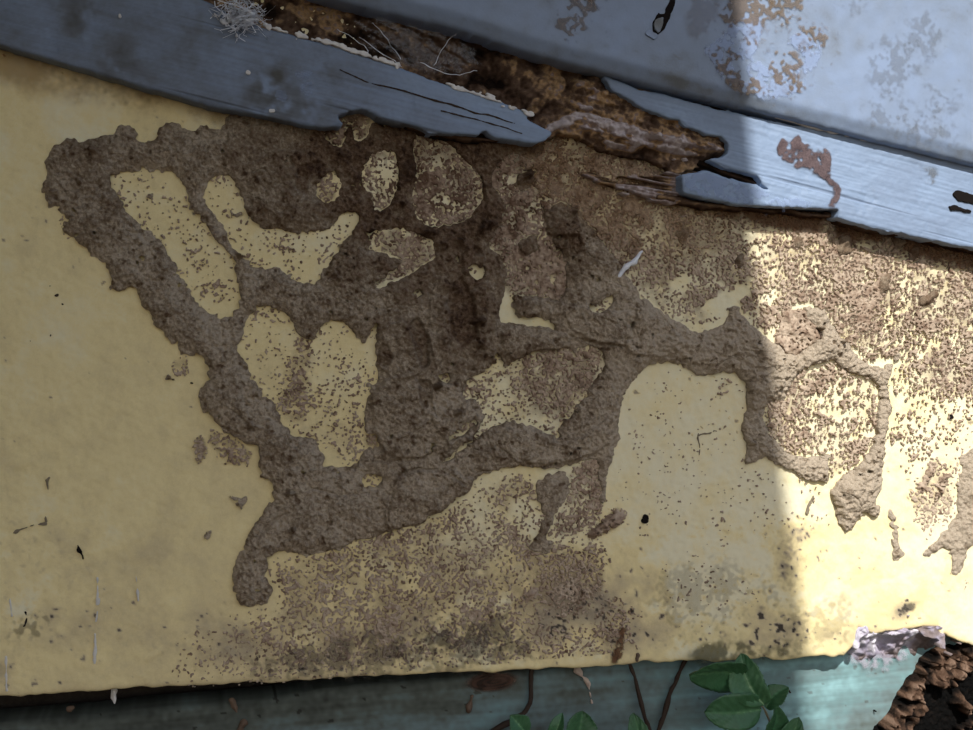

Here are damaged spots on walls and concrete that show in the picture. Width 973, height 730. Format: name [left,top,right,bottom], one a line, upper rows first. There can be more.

hole [645,0,675,40]
peeling [705,18,821,98]
crack [340,69,522,134]
spalling [847,615,962,661]